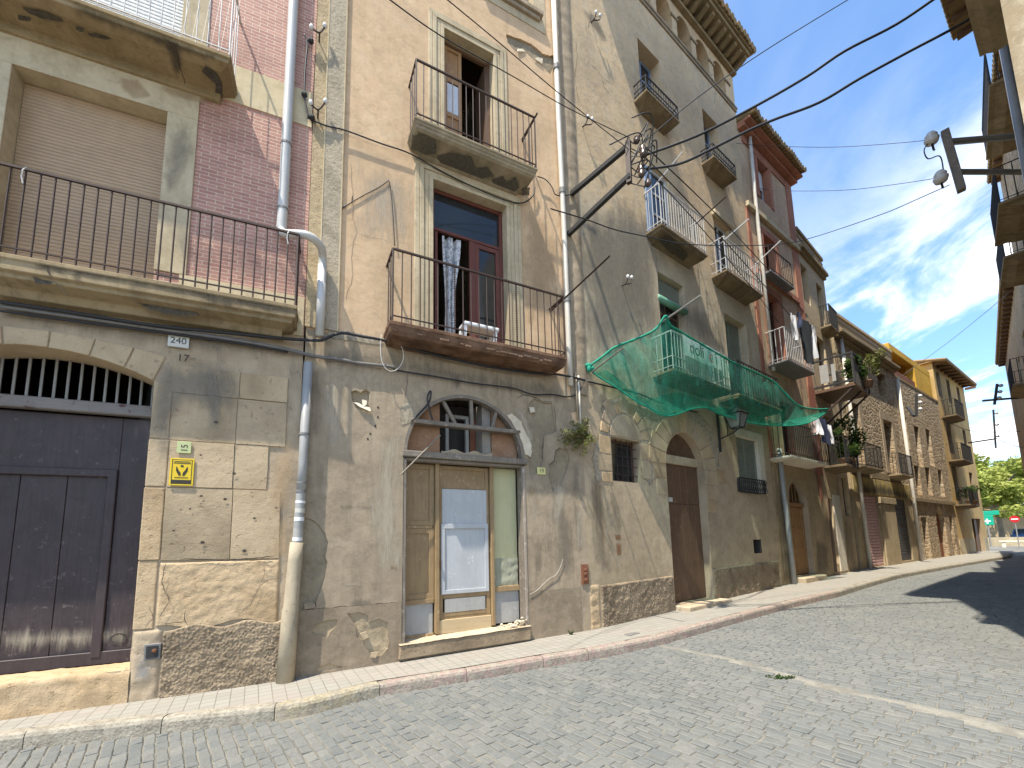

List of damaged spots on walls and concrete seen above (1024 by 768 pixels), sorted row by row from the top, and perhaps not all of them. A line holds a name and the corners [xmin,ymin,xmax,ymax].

leakage [202,66,223,97]
flaking render [411,134,530,196]
spalling [351,389,372,414]
spalling [518,399,570,492]
crack [146,564,187,627]
crack [238,561,280,616]
spalling [311,612,389,658]